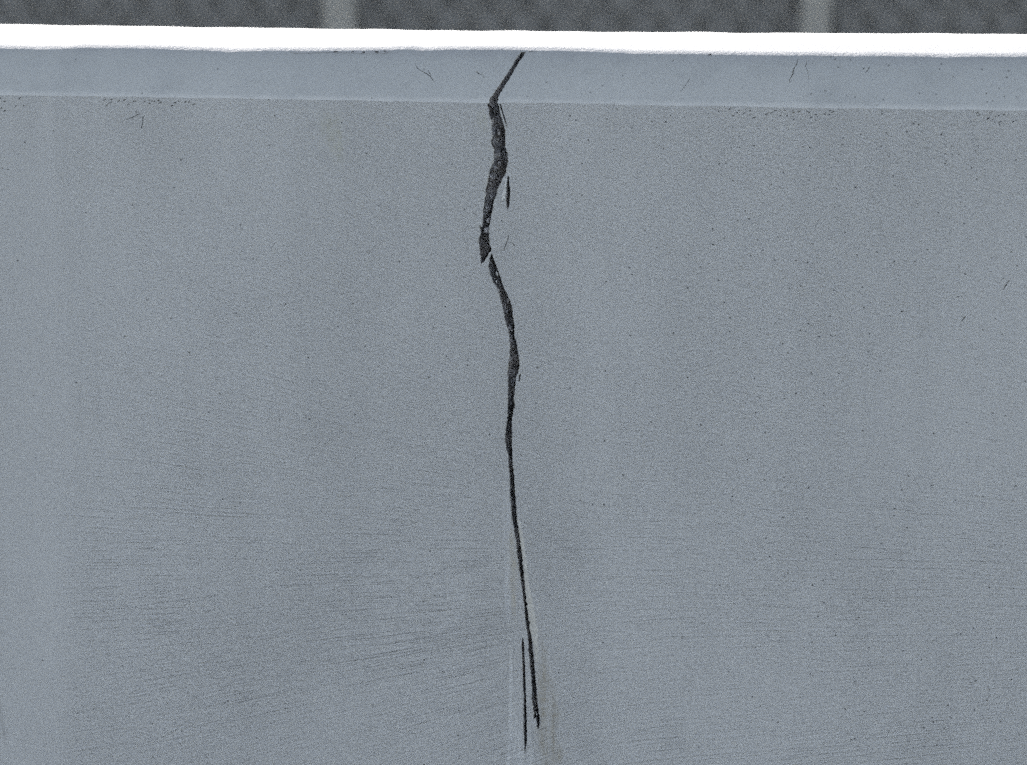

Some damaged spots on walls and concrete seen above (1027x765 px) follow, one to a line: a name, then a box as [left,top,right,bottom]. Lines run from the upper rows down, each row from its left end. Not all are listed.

crack [478,51,540,751]
damp [501,470,568,765]